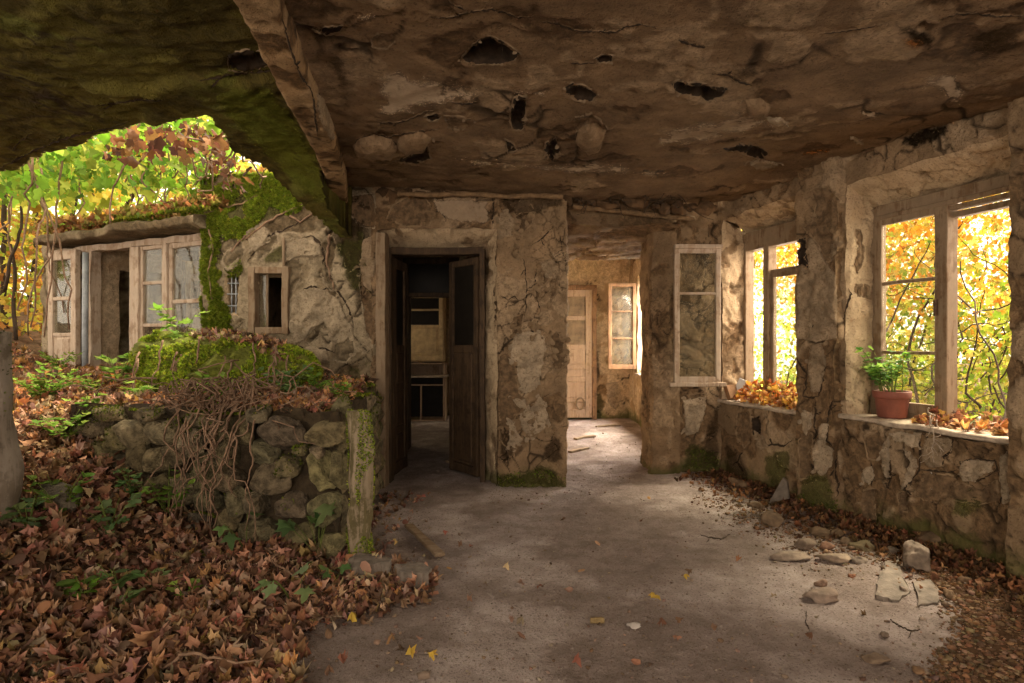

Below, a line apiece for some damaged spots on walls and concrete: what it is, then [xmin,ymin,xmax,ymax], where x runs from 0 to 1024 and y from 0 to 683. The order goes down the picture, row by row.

flaking render [543,136,560,161]
flaking render [562,82,609,132]
crack [224,219,354,328]
crack [501,227,567,317]
crack [843,288,853,319]
flaking render [496,263,571,459]
flaking render [855,431,1011,523]